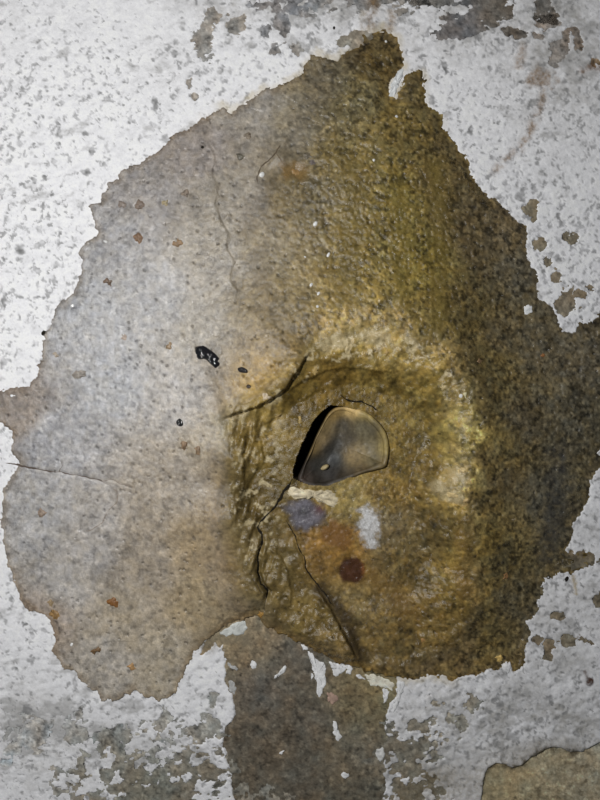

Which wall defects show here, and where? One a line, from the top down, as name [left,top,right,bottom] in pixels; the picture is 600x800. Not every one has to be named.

peeling [190,0,584,68]
spalling [336,29,600,335]
spalling [0,44,364,702]
water stain [237,479,273,526]
crack [246,477,333,606]
corrosion [216,323,475,670]
crack [341,395,376,410]
spalling [258,304,600,681]
water stain [259,34,600,674]
peeling [48,615,449,800]
peeling [425,693,484,741]
peeling [481,742,600,800]